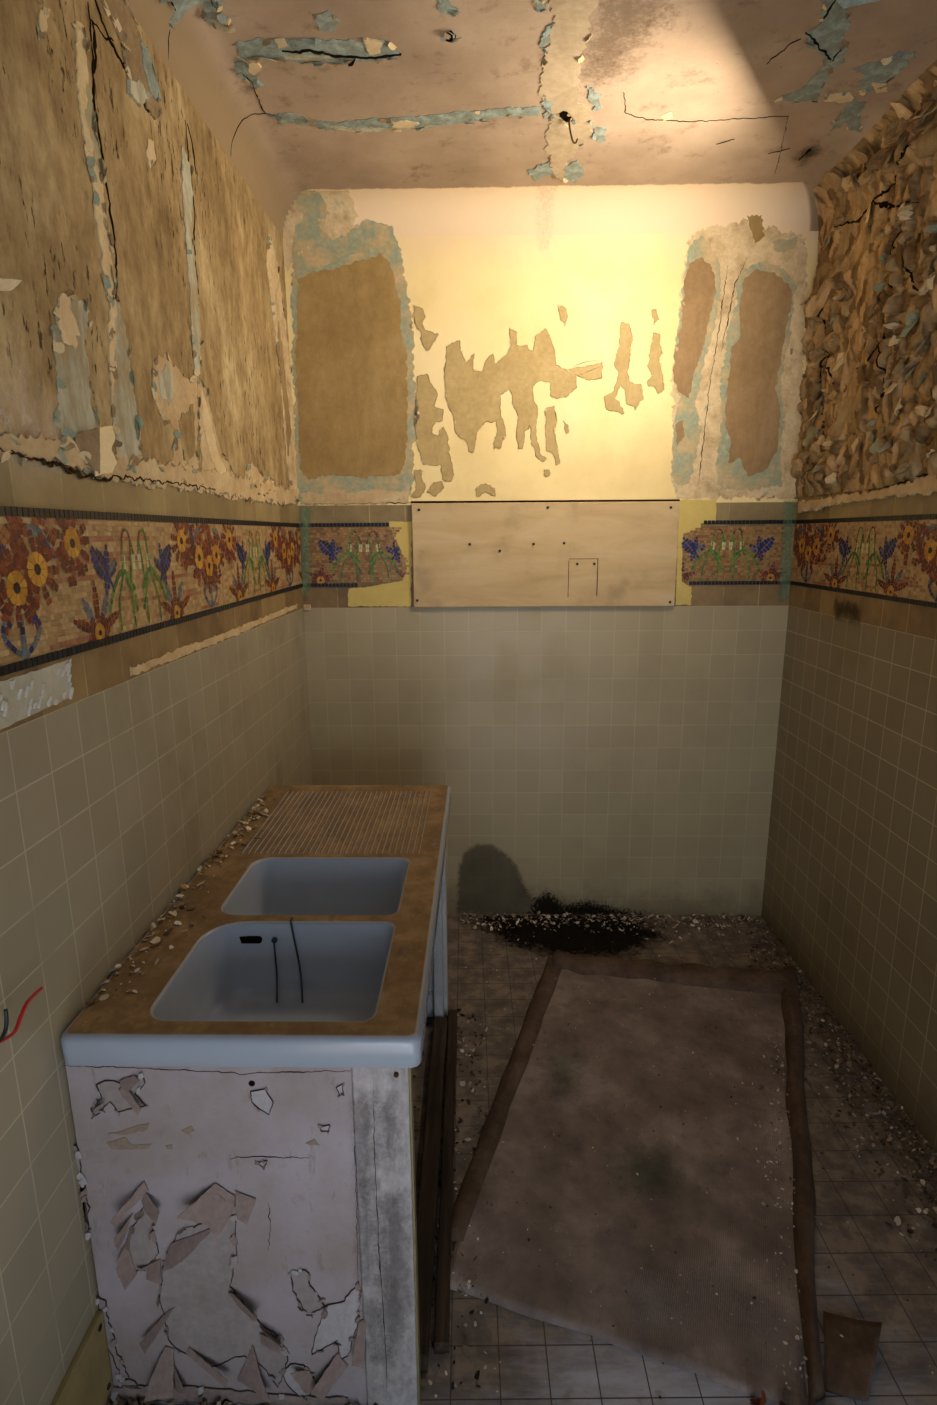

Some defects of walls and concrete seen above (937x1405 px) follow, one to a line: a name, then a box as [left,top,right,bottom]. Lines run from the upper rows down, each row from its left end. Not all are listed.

crack [282,49,401,67]
flaking render [0,0,937,607]
peeling [130,604,297,676]
peeling [0,658,74,730]
leakage [457,845,532,915]